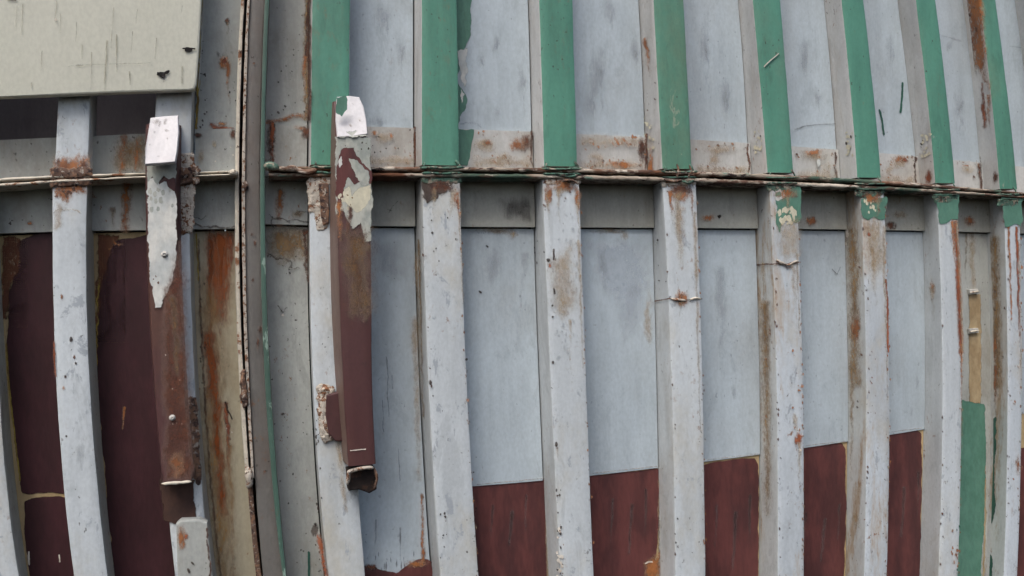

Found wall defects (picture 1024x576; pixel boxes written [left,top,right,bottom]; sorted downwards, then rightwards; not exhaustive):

rust [967,0,990,128]
rust [54,185,85,210]
rust [53,155,89,169]
peeling [146,164,193,308]
rust [163,0,312,576]
peeling [335,142,372,219]
rust [430,180,461,217]
peeling [773,189,797,229]
rust [848,193,904,418]
rust [951,216,975,383]